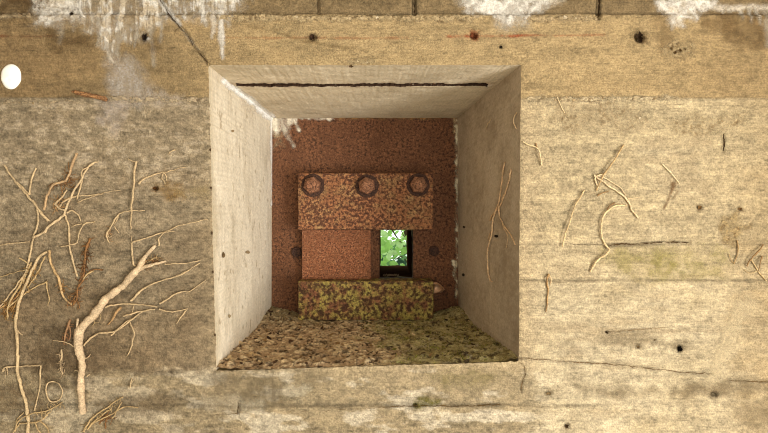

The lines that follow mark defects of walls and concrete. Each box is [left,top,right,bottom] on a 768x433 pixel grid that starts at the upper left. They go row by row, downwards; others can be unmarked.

leakage [2,0,239,96]
crack [160,0,208,65]
leakage [464,0,554,25]
leakage [656,0,768,35]
crack [236,81,488,89]
leakage [222,79,310,191]
crack [573,239,689,247]
crack [519,358,709,391]